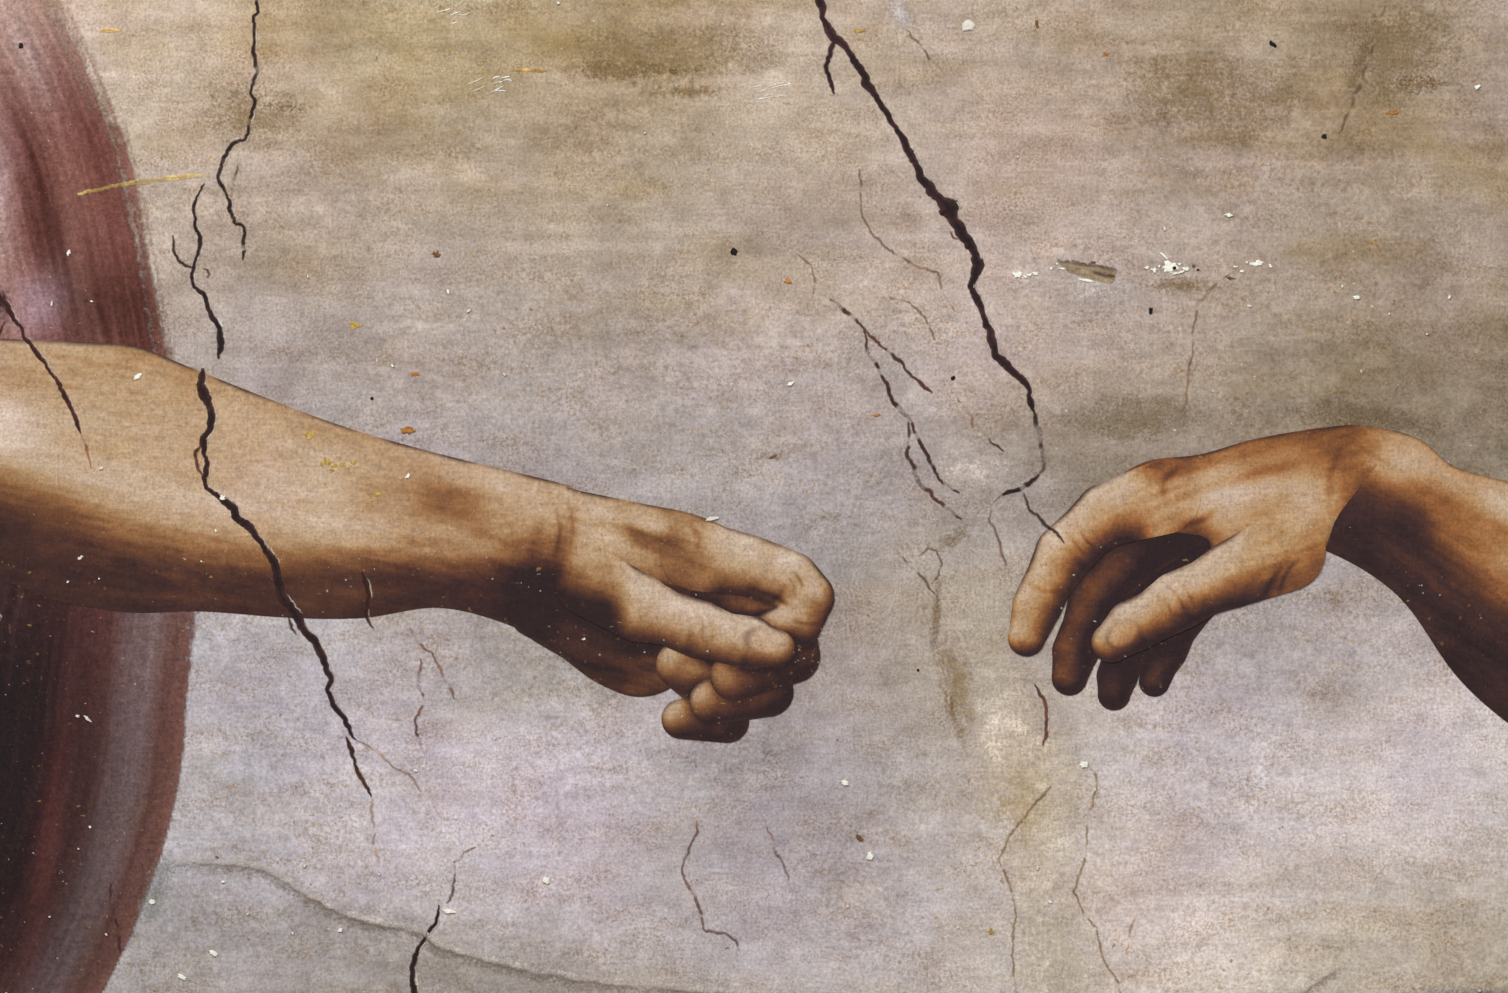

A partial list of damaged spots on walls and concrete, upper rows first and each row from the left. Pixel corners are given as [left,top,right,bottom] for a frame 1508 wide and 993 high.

crack [799,0,1064,564]
crack [0,295,91,466]
crack [172,0,421,856]
crack [918,547,943,595]
crack [414,644,454,736]
crack [409,847,474,993]
crack [681,820,738,945]